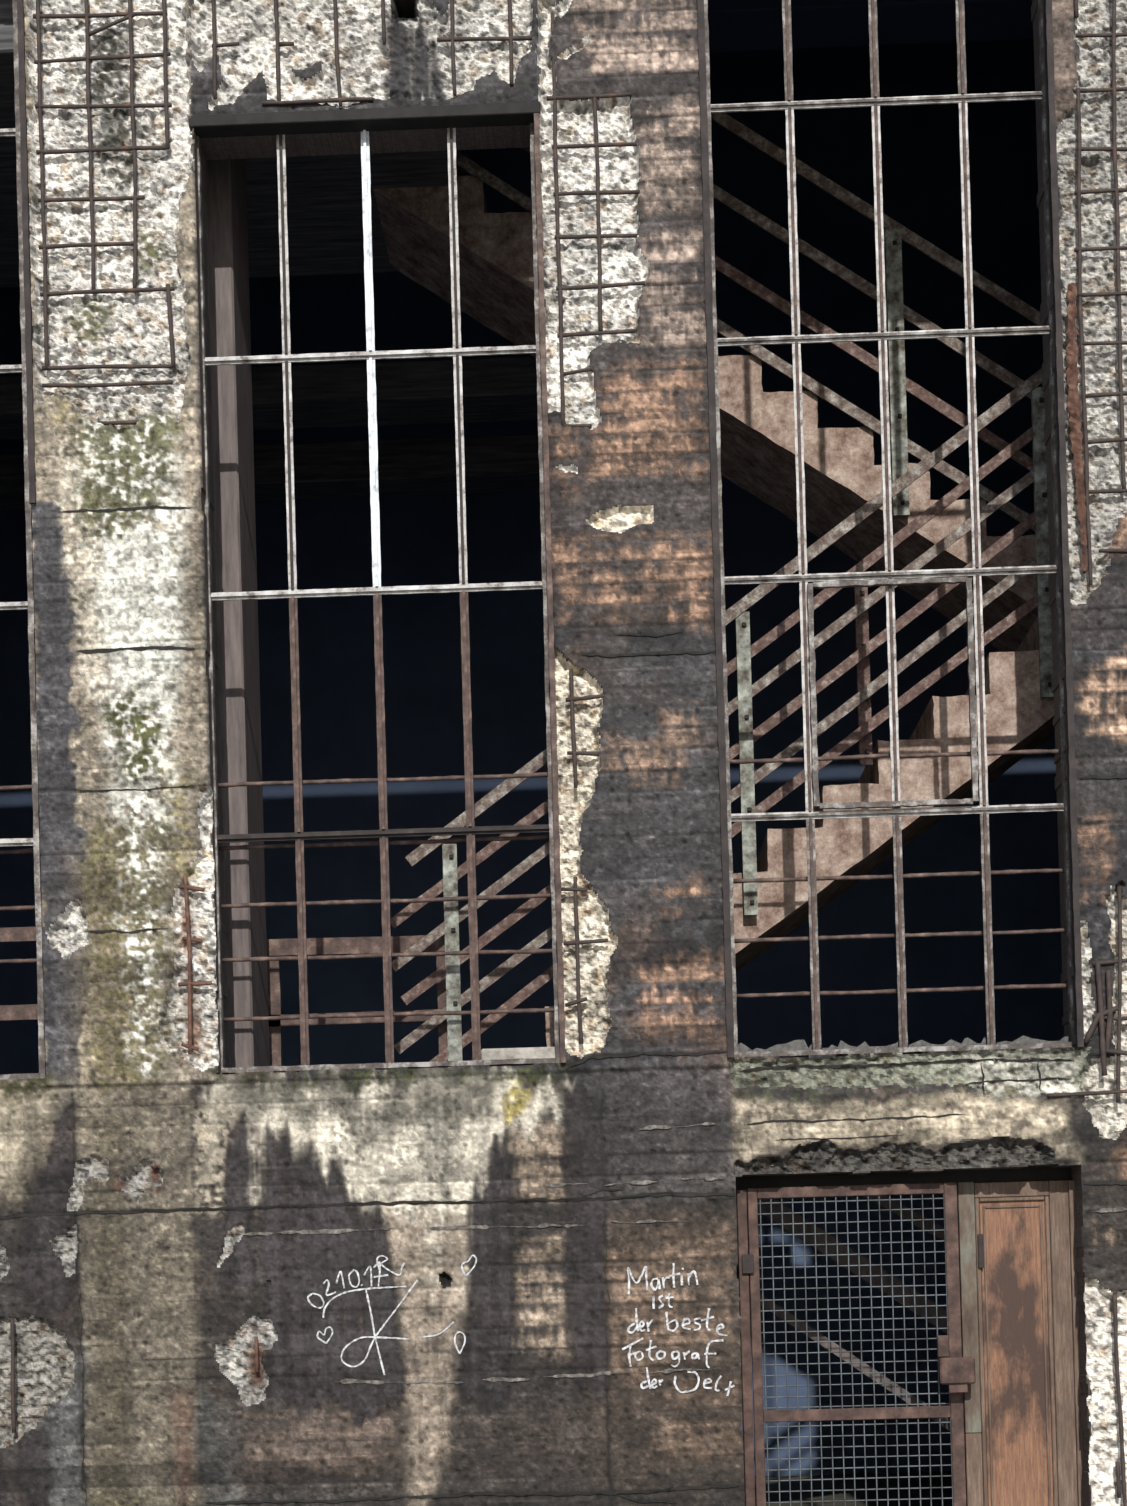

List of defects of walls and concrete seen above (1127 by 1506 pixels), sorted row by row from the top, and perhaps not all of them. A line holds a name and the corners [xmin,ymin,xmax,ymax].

spalling [26,0,706,476]
spalling [1056,0,1127,606]
peeling [551,505,711,627]
damp [59,414,182,1075]
spalling [554,647,701,1058]
peeling [640,958,721,1033]
spalling [729,825,1127,1177]
spalling [0,1245,10,1279]
spalling [0,1315,76,1448]
spalling [214,1316,278,1406]
spalling [1084,1278,1127,1506]